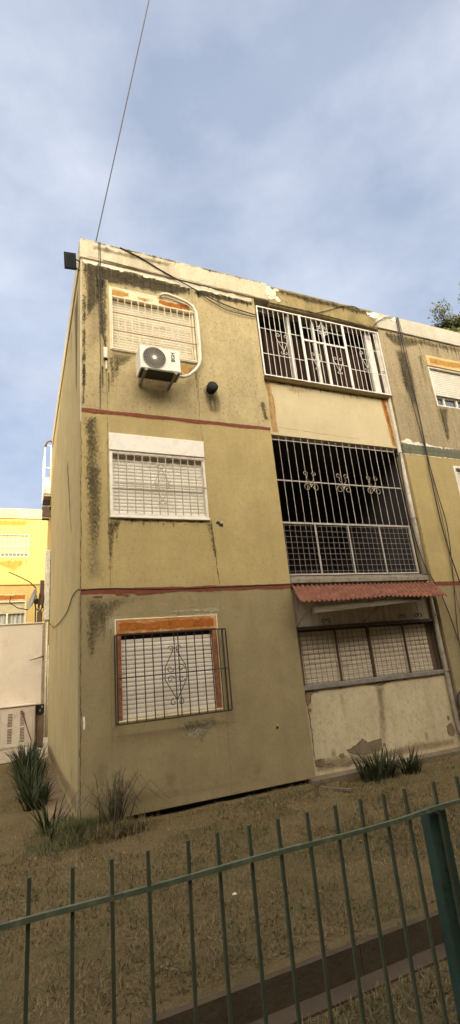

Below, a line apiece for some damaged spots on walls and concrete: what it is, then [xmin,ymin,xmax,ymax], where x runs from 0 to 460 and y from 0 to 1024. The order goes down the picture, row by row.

peeling [265,286,281,302]
leakage [74,263,252,403]
leakage [386,332,458,403]
leakage [441,409,449,439]
leakage [87,419,99,539]
leakage [89,601,118,649]
spalling [315,738,386,767]